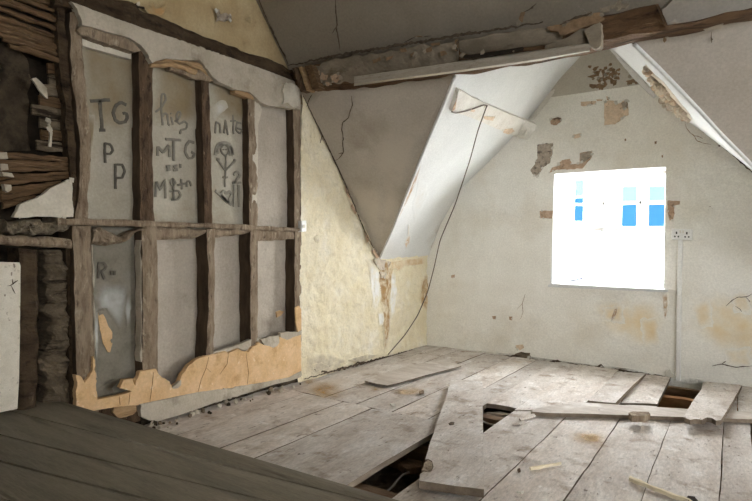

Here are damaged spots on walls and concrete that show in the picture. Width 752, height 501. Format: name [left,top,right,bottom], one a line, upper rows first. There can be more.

crack [259,0,592,66]
spalling [69,2,301,180]
spalling [581,63,692,125]
crack [303,95,378,255]
peeling [530,143,594,178]
peeling [667,200,680,221]
peeling [72,306,302,421]